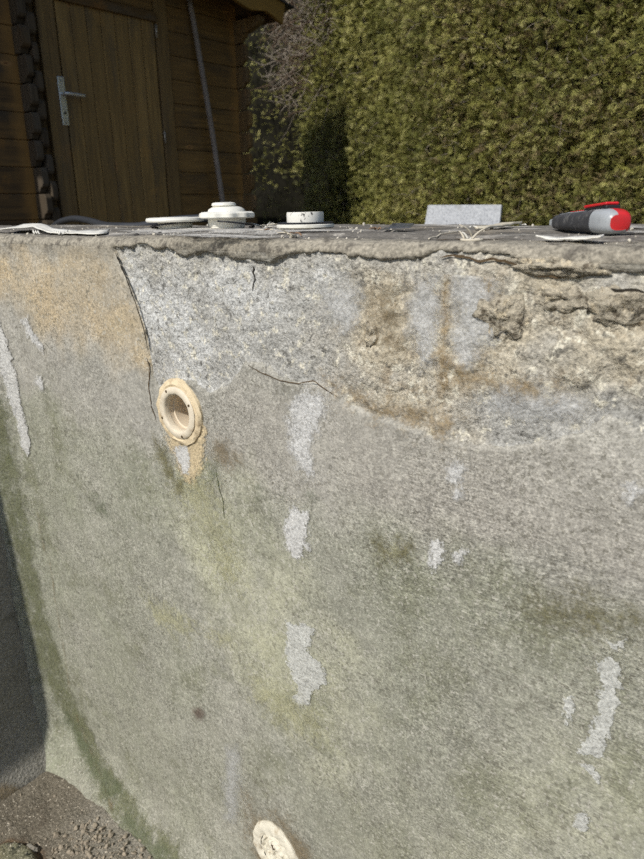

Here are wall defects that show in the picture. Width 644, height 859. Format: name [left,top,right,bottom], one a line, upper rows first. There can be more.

damp [20,317,43,351]
crack [115,253,155,416]
spalling [116,244,644,448]
corrosion [159,425,207,491]
damp [285,389,325,476]
damp [282,506,311,560]
damp [0,325,179,859]